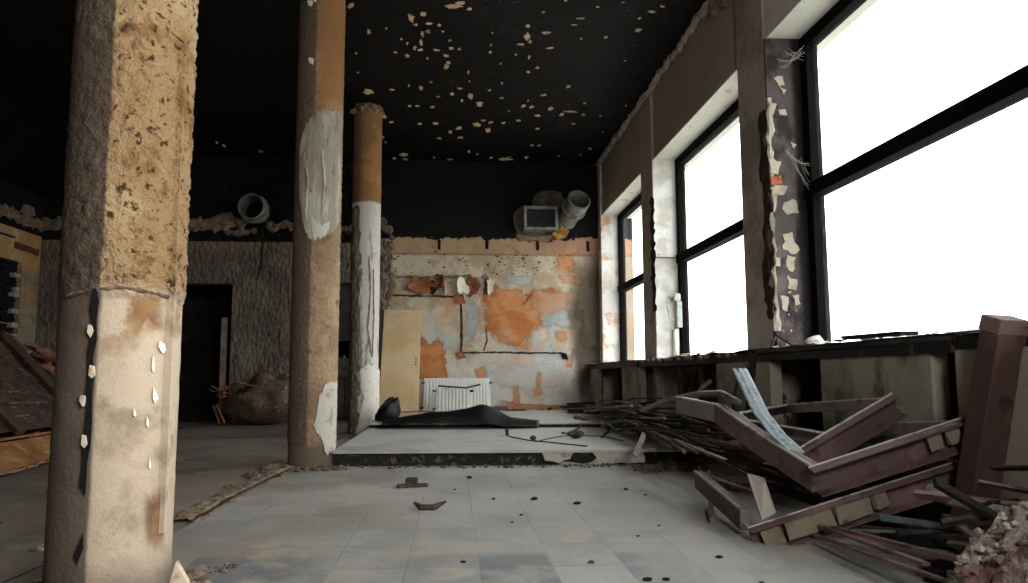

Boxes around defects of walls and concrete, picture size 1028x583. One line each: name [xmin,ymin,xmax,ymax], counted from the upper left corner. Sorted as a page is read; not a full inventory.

peeling [394,12,461,69]
peeling [408,71,586,161]
peeling [515,24,551,73]
spalling [579,0,730,167]
spalling [758,76,800,331]
peeling [188,89,572,433]
peeling [313,380,337,455]